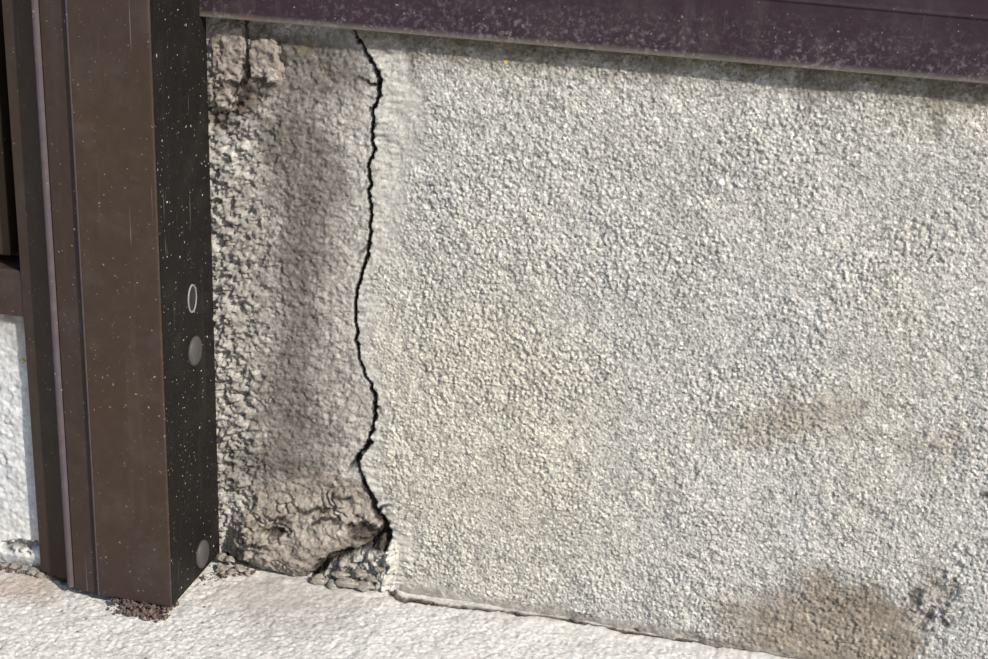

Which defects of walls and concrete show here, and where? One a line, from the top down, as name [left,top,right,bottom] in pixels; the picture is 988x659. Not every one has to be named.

peeling [208,20,288,127]
leakage [270,115,337,477]
crack [308,30,706,645]
crack [215,552,256,577]
leakage [760,576,914,659]